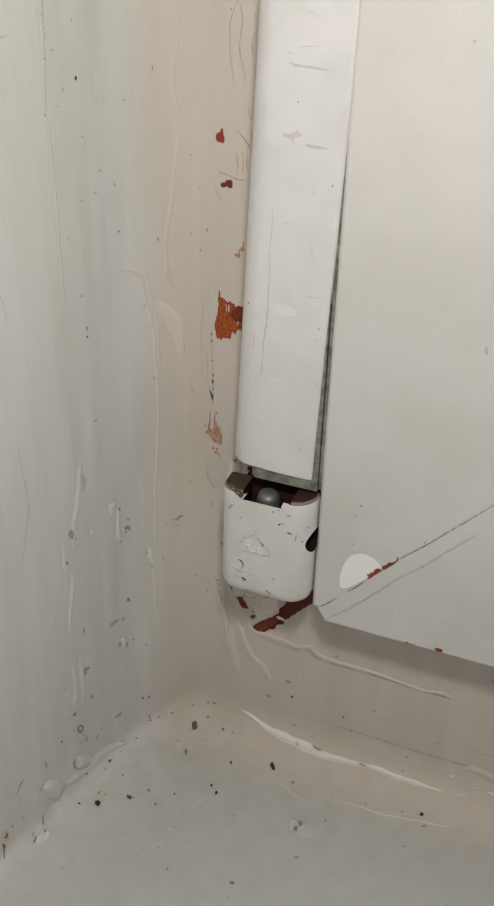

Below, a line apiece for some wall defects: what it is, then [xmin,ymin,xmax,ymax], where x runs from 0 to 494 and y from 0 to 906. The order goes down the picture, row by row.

peeling [233,588,286,625]